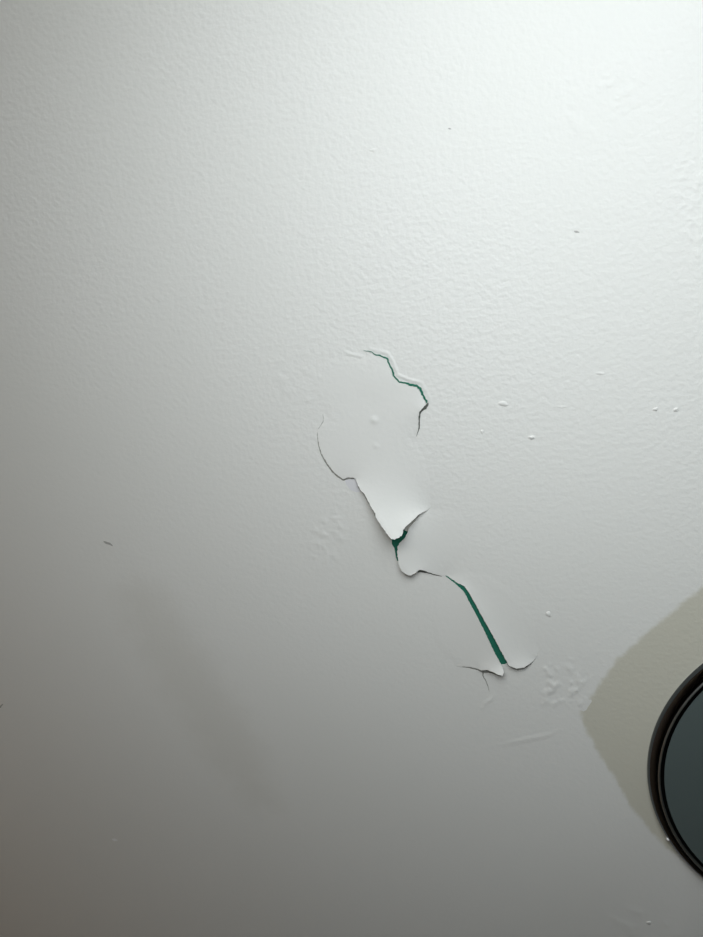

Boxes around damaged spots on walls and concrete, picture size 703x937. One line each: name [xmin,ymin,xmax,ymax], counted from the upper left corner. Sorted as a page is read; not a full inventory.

crack [364,346,434,436]
peeling [313,352,540,690]
leakage [571,573,703,883]